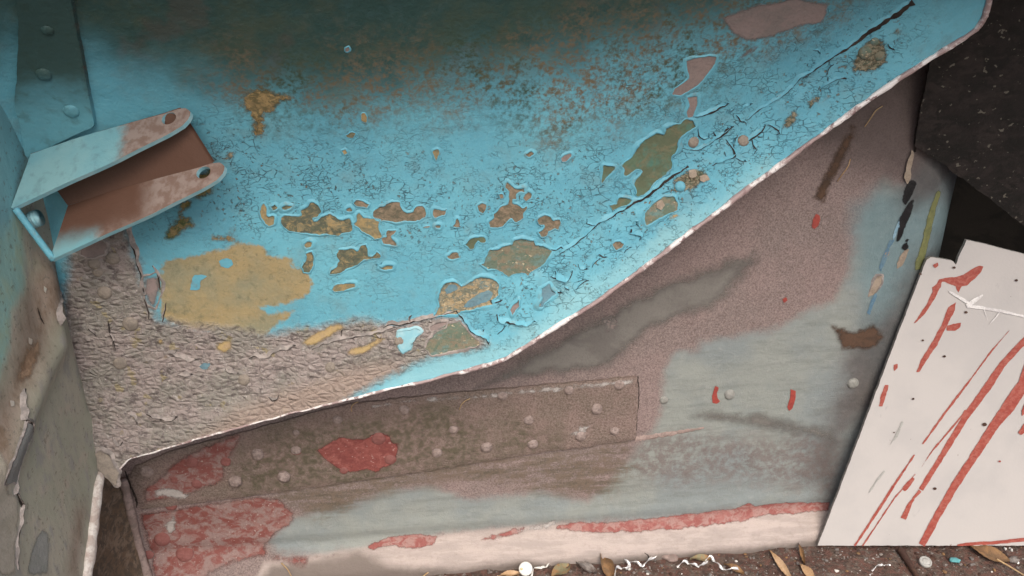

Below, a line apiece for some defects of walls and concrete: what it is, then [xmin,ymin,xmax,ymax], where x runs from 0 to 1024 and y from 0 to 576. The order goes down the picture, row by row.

peeling [723,0,827,56]
peeling [600,54,719,228]
crack [551,0,915,293]
corrosion [816,126,853,202]
peeling [190,275,207,290]
peeling [219,258,233,268]
peeling [258,178,562,357]
water stain [499,259,753,379]
peeling [318,434,398,472]
peeling [141,435,308,576]
peeling [368,534,437,550]
peeling [484,502,830,540]